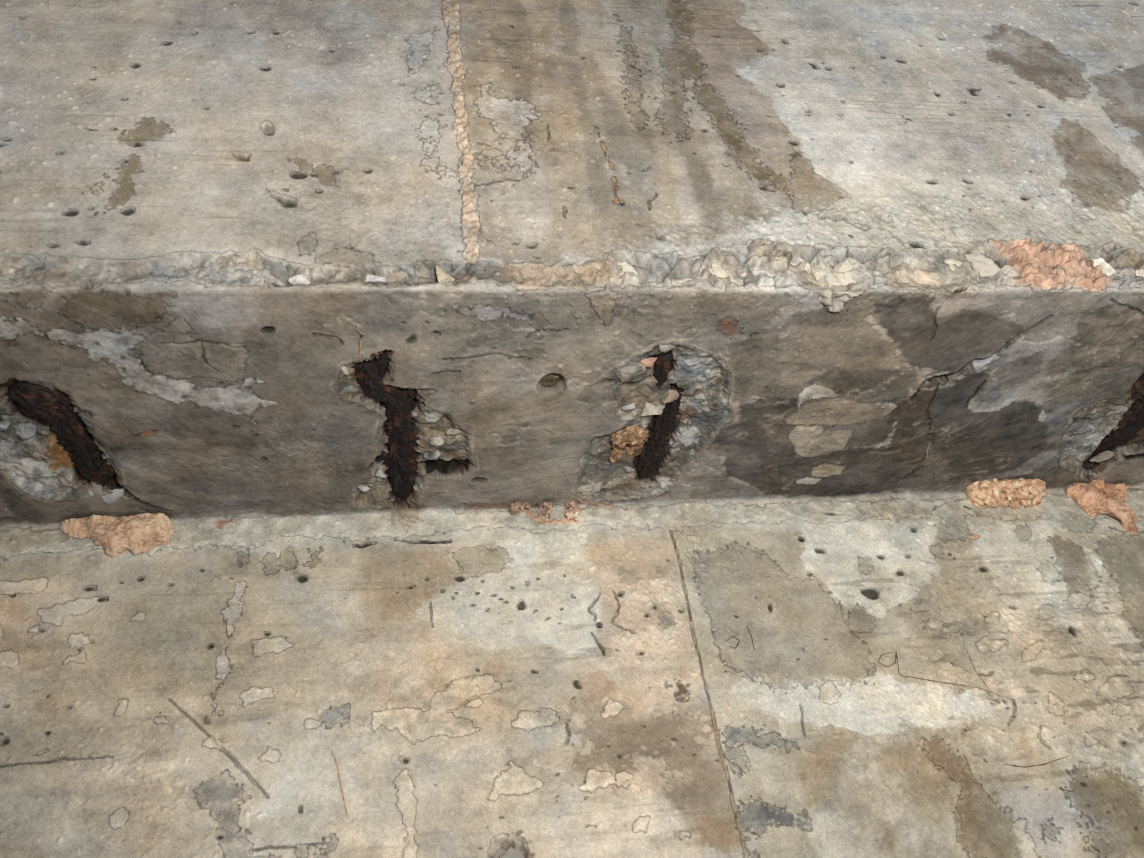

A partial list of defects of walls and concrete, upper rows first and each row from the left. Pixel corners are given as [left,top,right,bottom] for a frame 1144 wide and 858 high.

leakage [617,0,848,213]
leakage [983,24,1144,152]
leakage [1050,119,1142,213]
crack [930,285,969,339]
spalling [0,378,125,504]
spalling [332,350,477,508]
spalling [575,341,735,502]
crack [891,315,1050,516]
spalling [1058,368,1144,482]